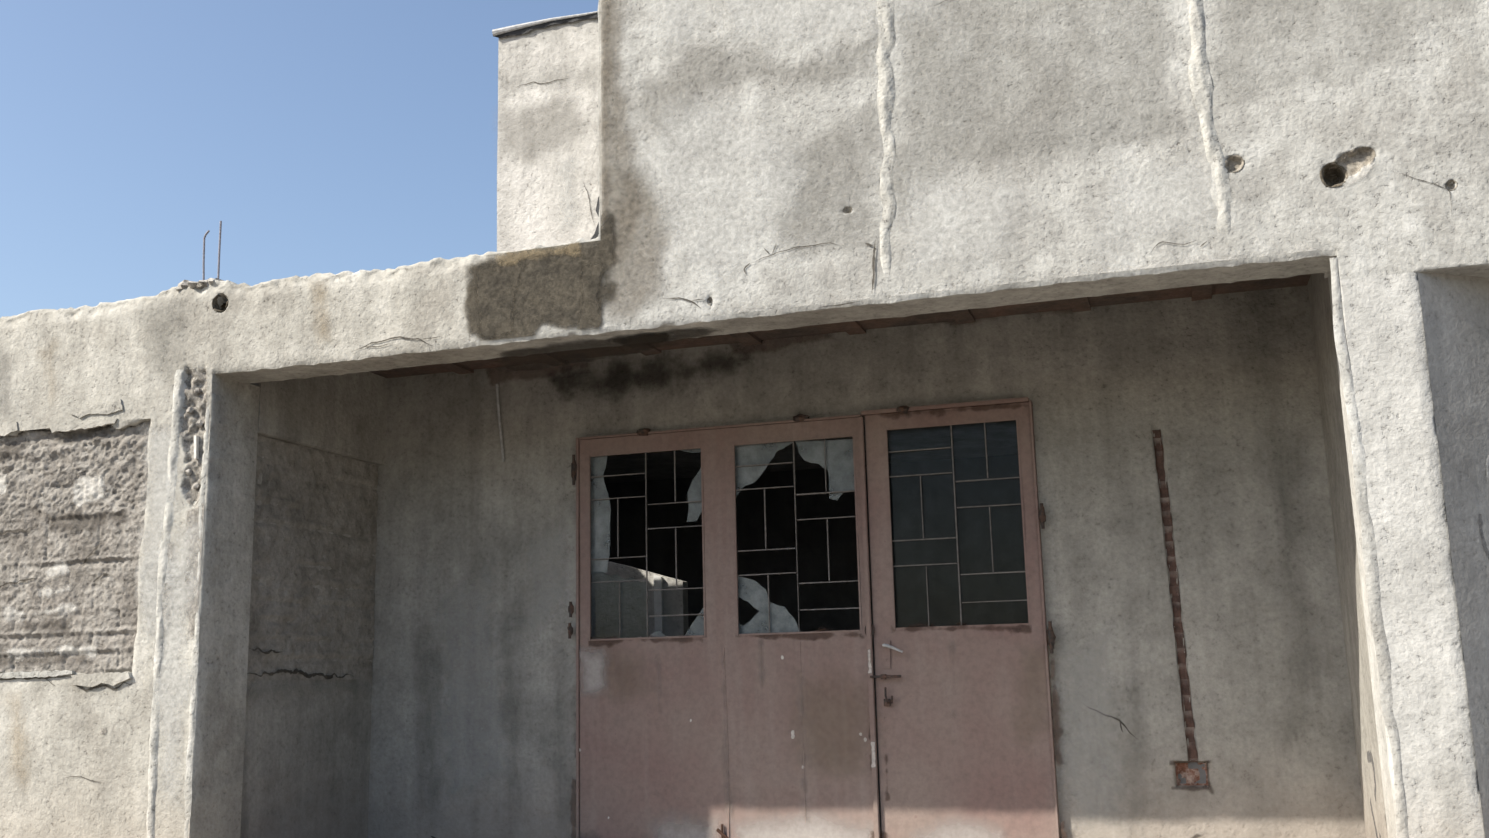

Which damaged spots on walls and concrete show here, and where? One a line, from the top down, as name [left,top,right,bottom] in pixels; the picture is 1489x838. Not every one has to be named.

water stain [465,144,733,395]
crack [743,240,876,307]
spalling [1320,146,1375,187]
spalling [0,368,208,691]